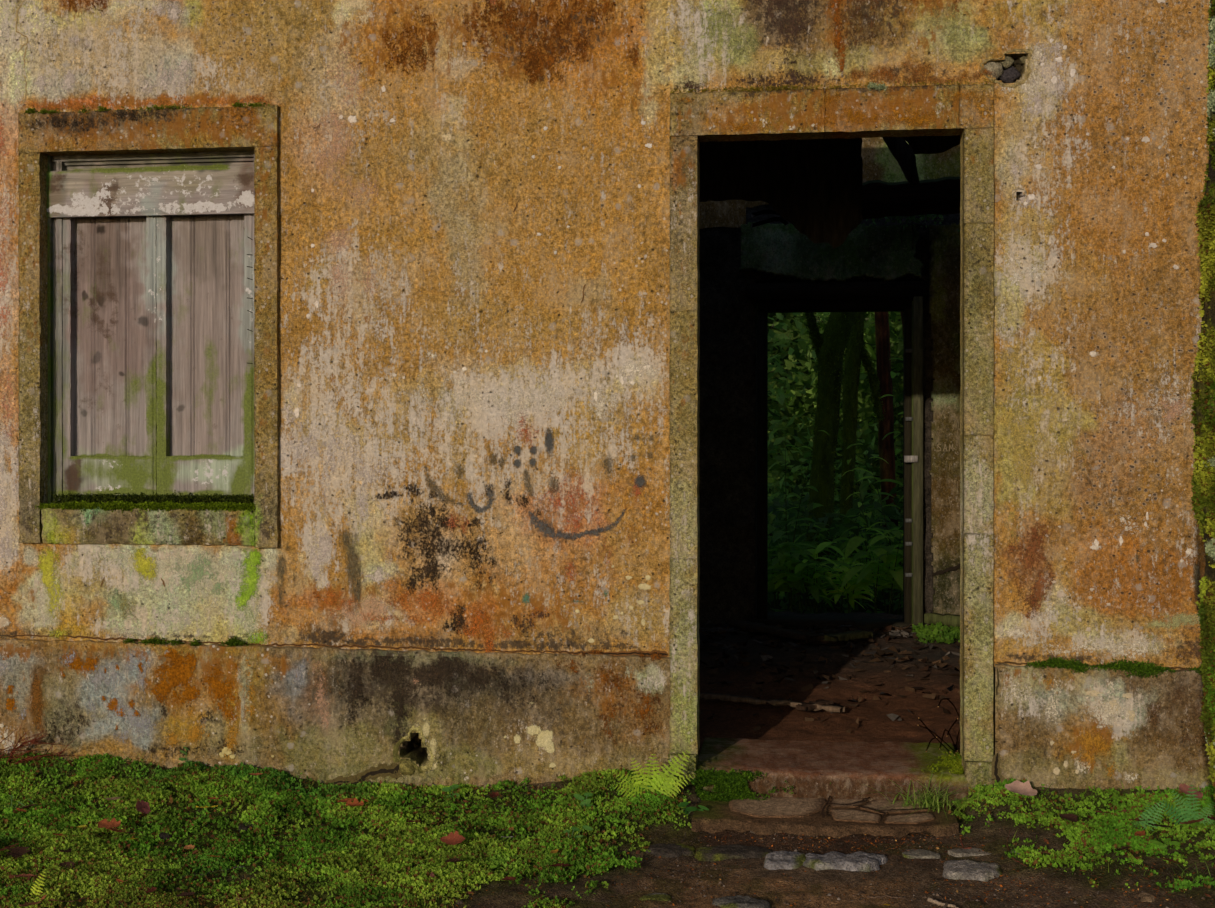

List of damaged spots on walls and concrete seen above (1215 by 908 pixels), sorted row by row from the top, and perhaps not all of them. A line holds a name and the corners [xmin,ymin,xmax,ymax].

crack [16,0,28,104]
corrosion [457,0,625,86]
leakage [753,0,820,73]
leakage [279,401,499,628]
leakage [485,478,541,516]
leakage [340,648,664,749]
spalling [392,718,437,776]